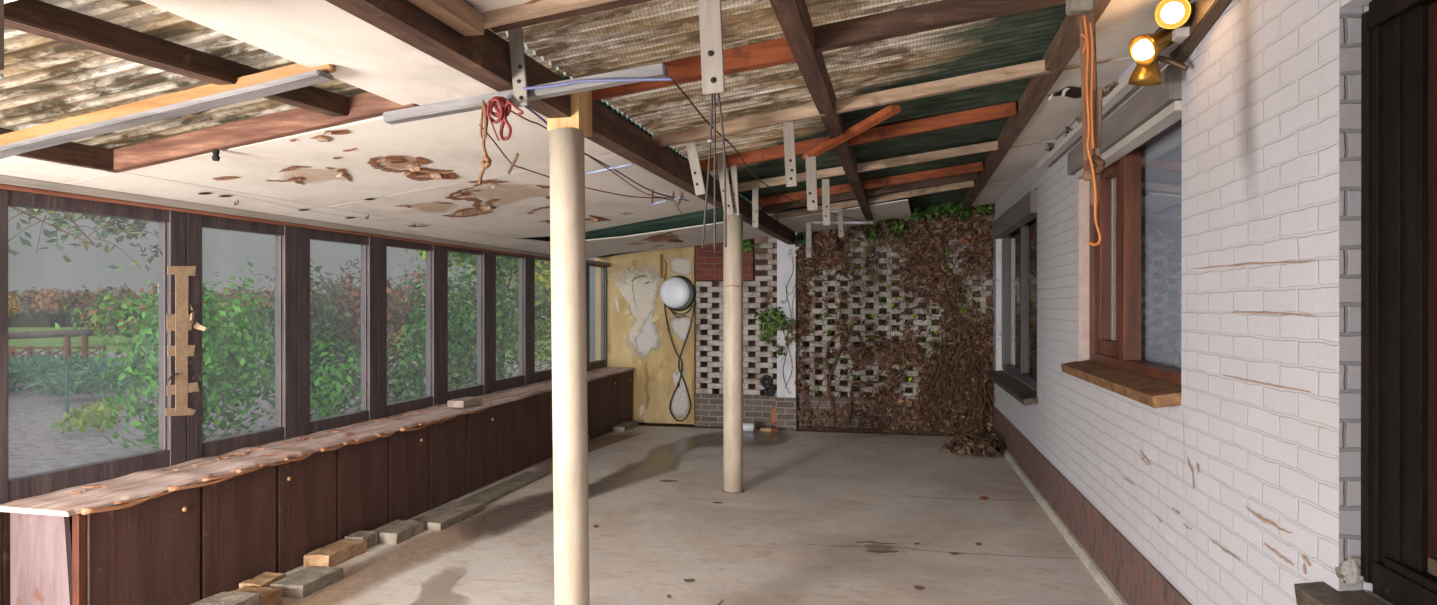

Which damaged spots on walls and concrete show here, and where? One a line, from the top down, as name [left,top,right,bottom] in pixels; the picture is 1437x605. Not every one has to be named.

peeling [613,258,692,365]
damp [743,429,786,446]
damp [588,432,723,498]
damp [467,492,553,535]
damp [410,573,459,605]